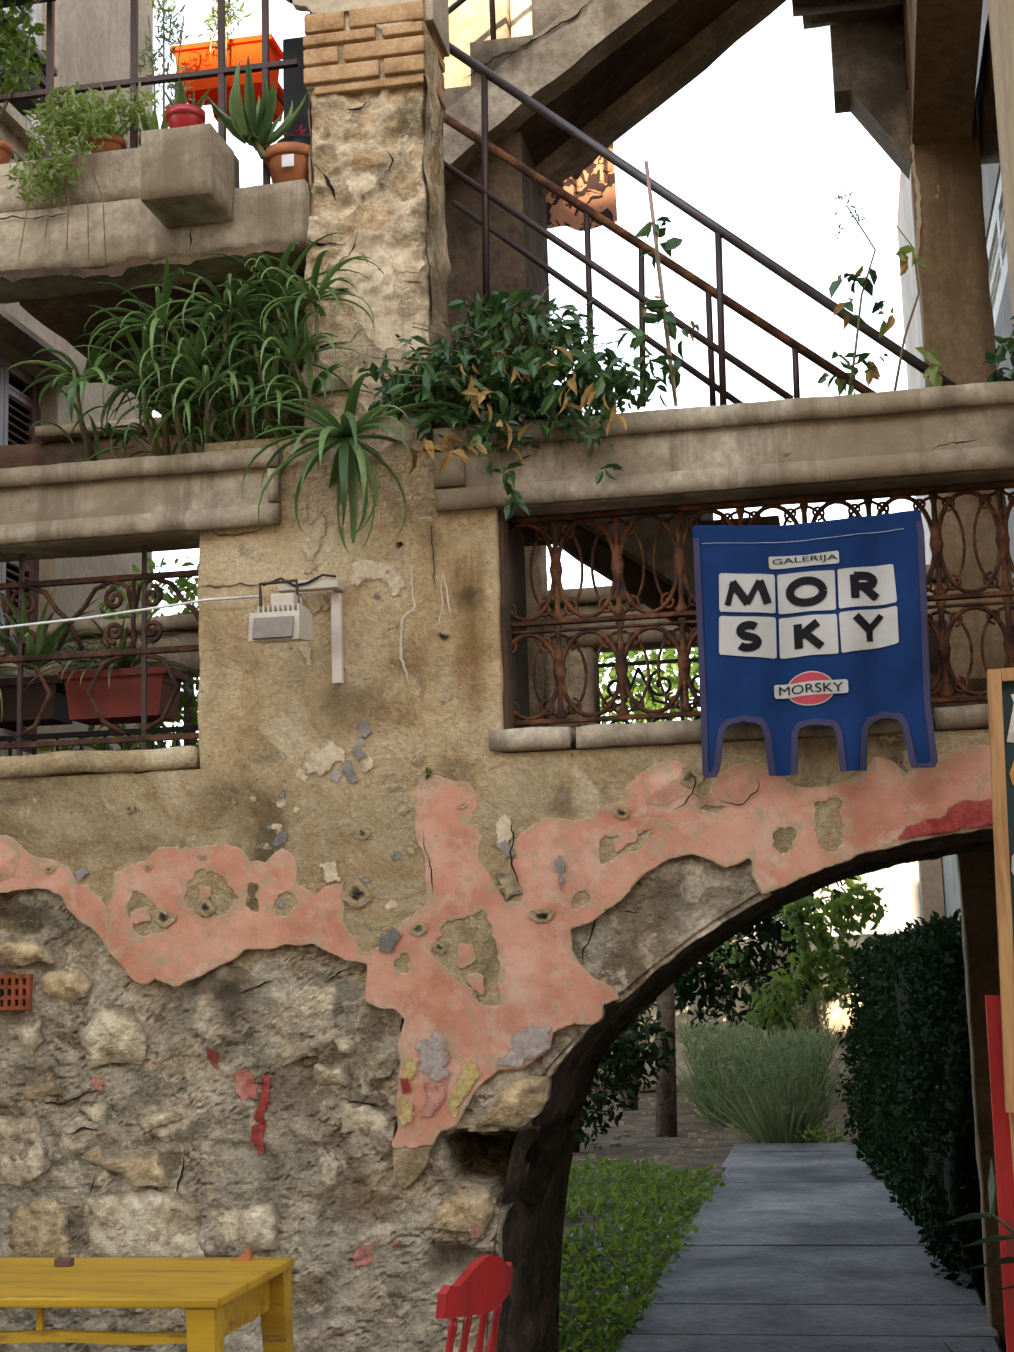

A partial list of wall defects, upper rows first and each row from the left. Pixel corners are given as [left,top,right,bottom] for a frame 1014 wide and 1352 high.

crack [465,0,593,78]
spalling [279,720,375,803]
spalling [0,744,993,1352]